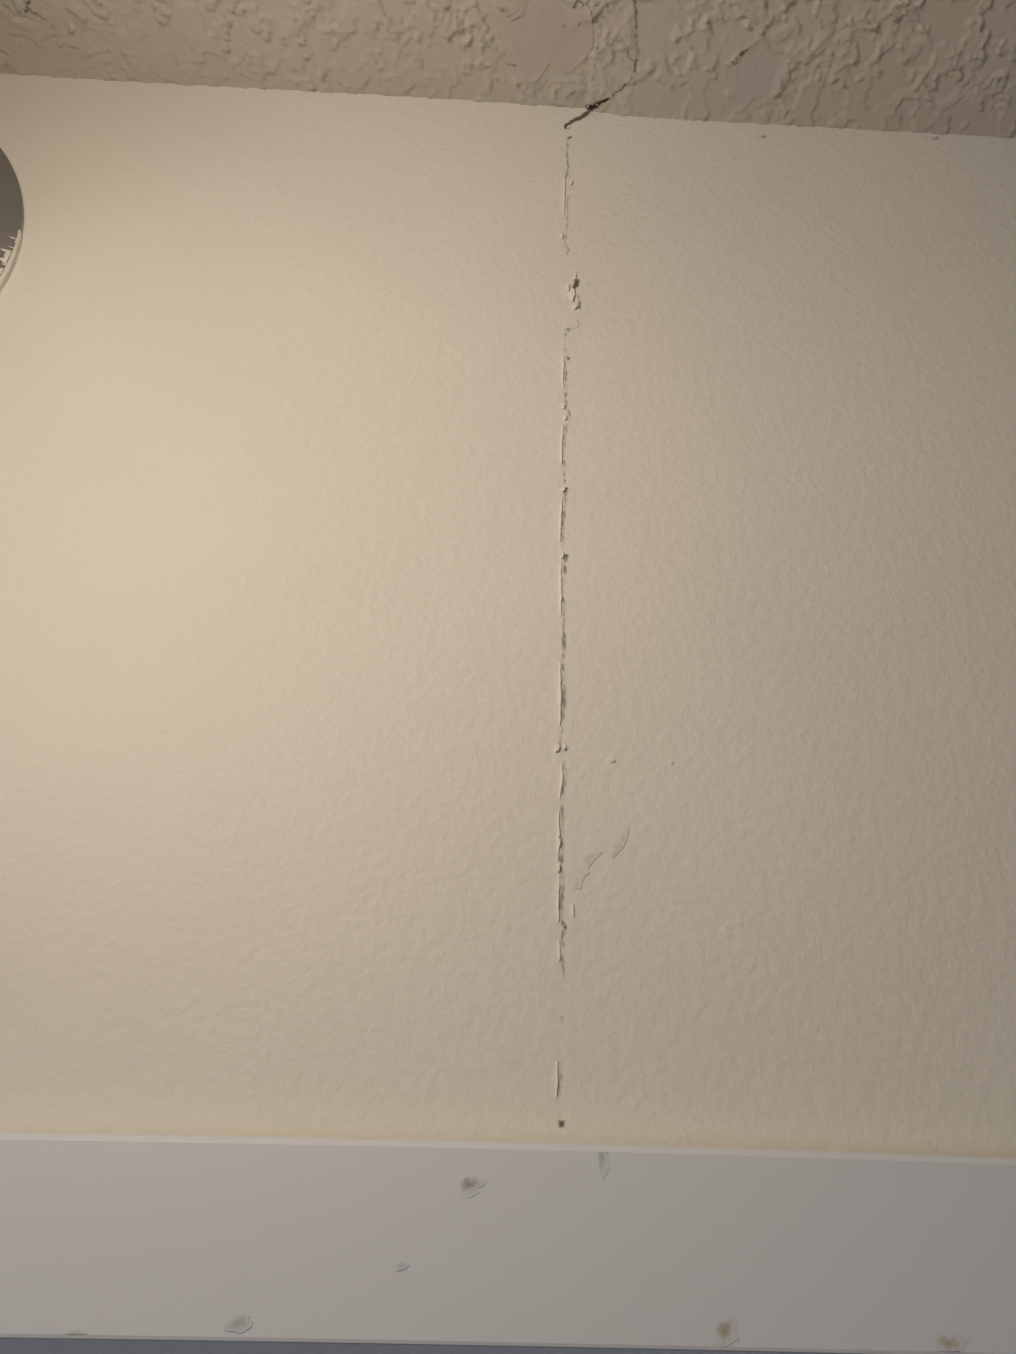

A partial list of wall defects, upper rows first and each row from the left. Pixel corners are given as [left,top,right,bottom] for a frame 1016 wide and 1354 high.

crack [564,66,636,139]
crack [555,274,629,960]